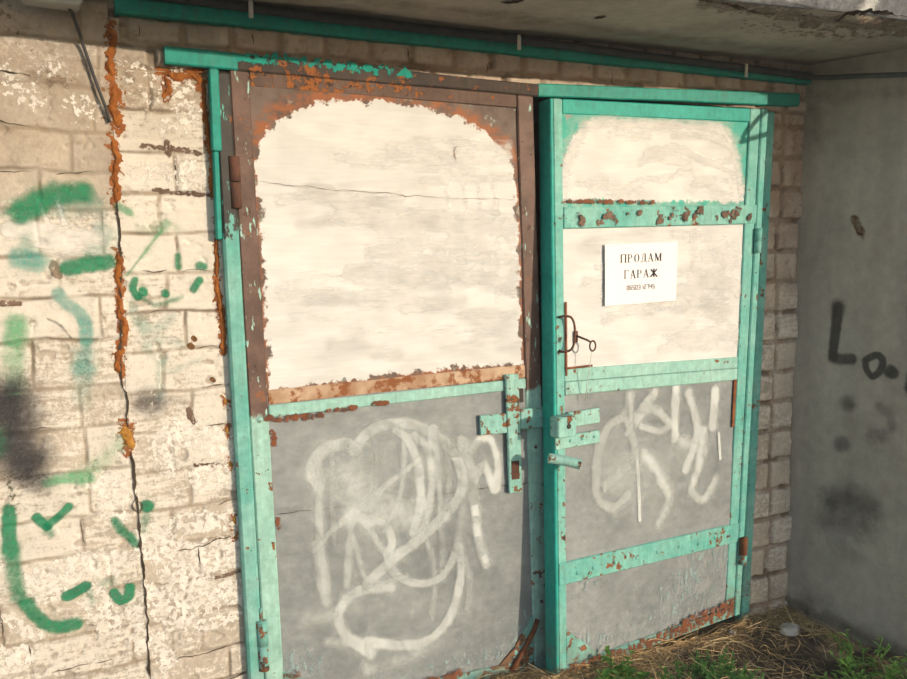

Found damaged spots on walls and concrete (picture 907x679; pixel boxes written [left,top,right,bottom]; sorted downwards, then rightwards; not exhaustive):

peeling [0,56,104,128]
corrosion [564,198,656,227]
corrosion [657,205,704,226]
corrosion [716,206,752,223]
corrosion [851,215,865,235]
crack [114,153,129,426]
corrosion [264,365,525,447]
crack [179,536,230,562]
crack [130,451,151,679]
crack [177,642,244,660]
corrosion [560,598,735,676]
corrosion [425,669,463,679]